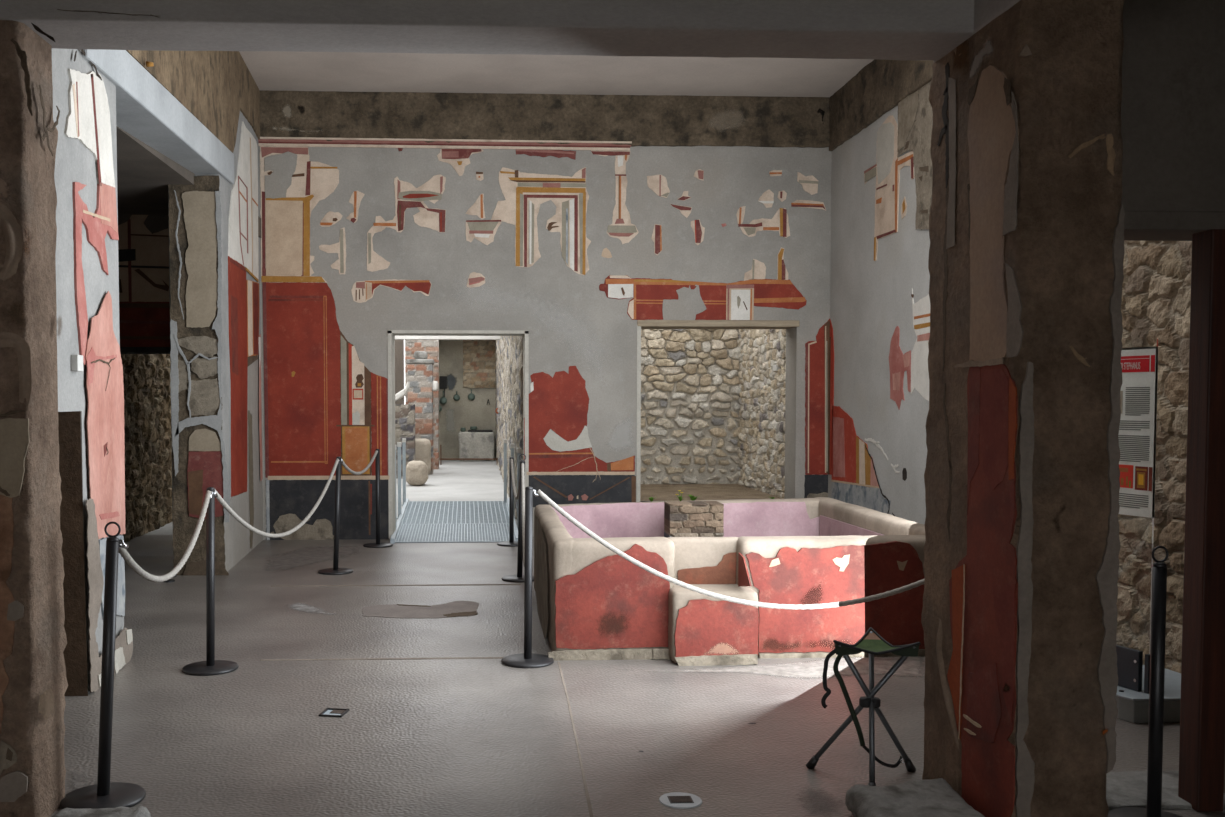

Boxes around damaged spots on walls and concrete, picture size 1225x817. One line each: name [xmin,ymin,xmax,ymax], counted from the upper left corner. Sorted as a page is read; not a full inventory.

spalling [897,81,933,230]
flaking render [168,175,229,576]
flaking render [543,426,592,452]
flaking render [662,285,706,320]